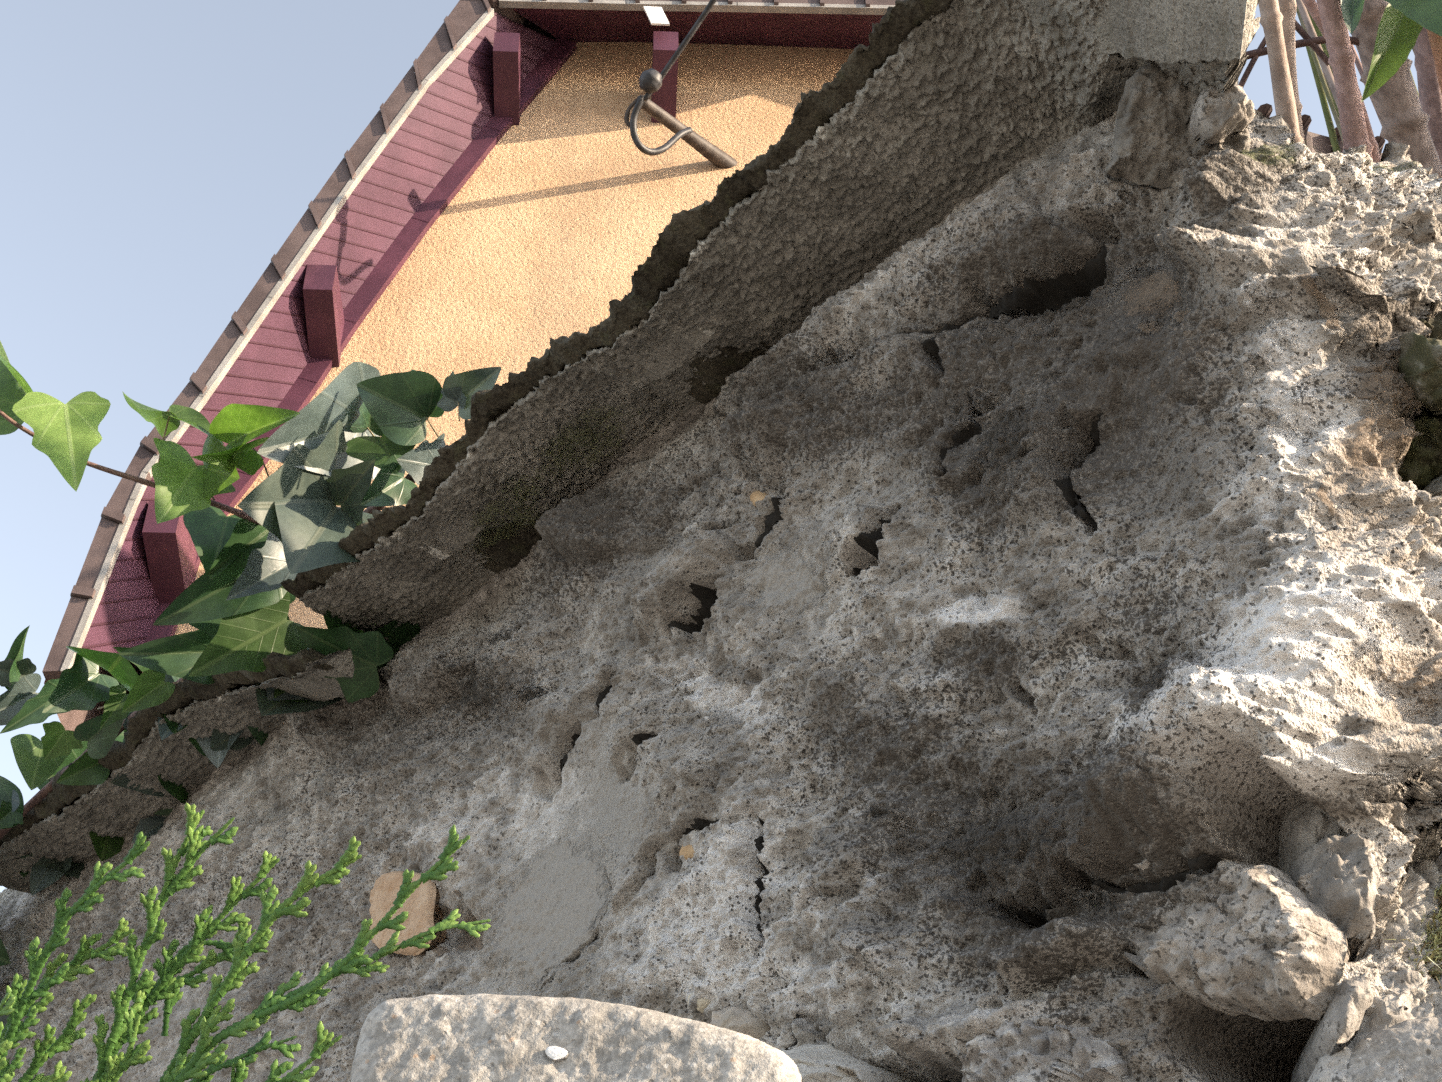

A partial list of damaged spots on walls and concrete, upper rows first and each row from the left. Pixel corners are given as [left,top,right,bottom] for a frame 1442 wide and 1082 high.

spalling [1126,272,1189,334]
spalling [1346,355,1422,468]
spalling [1378,662,1442,732]
crack [682,818,719,835]
flaking render [369,871,484,957]
crack [754,818,769,956]